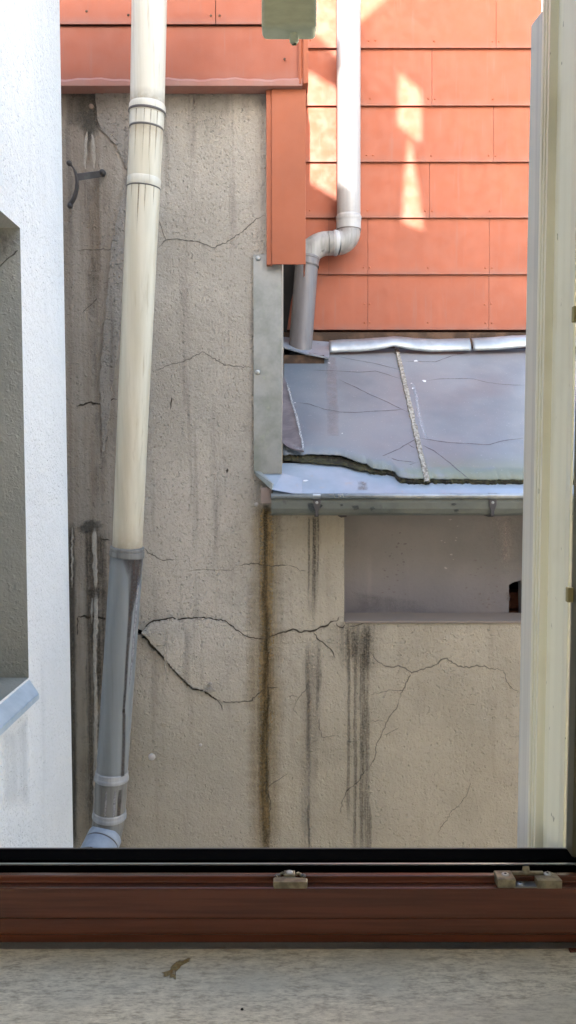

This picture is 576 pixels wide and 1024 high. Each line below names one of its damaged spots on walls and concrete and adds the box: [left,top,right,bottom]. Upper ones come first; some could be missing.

leakage [83,115,96,169]
crack [158,215,264,248]
crack [155,352,251,371]
leakage [69,521,121,839]
crack [144,617,361,747]
leakage [347,626,371,833]
crack [340,658,517,812]